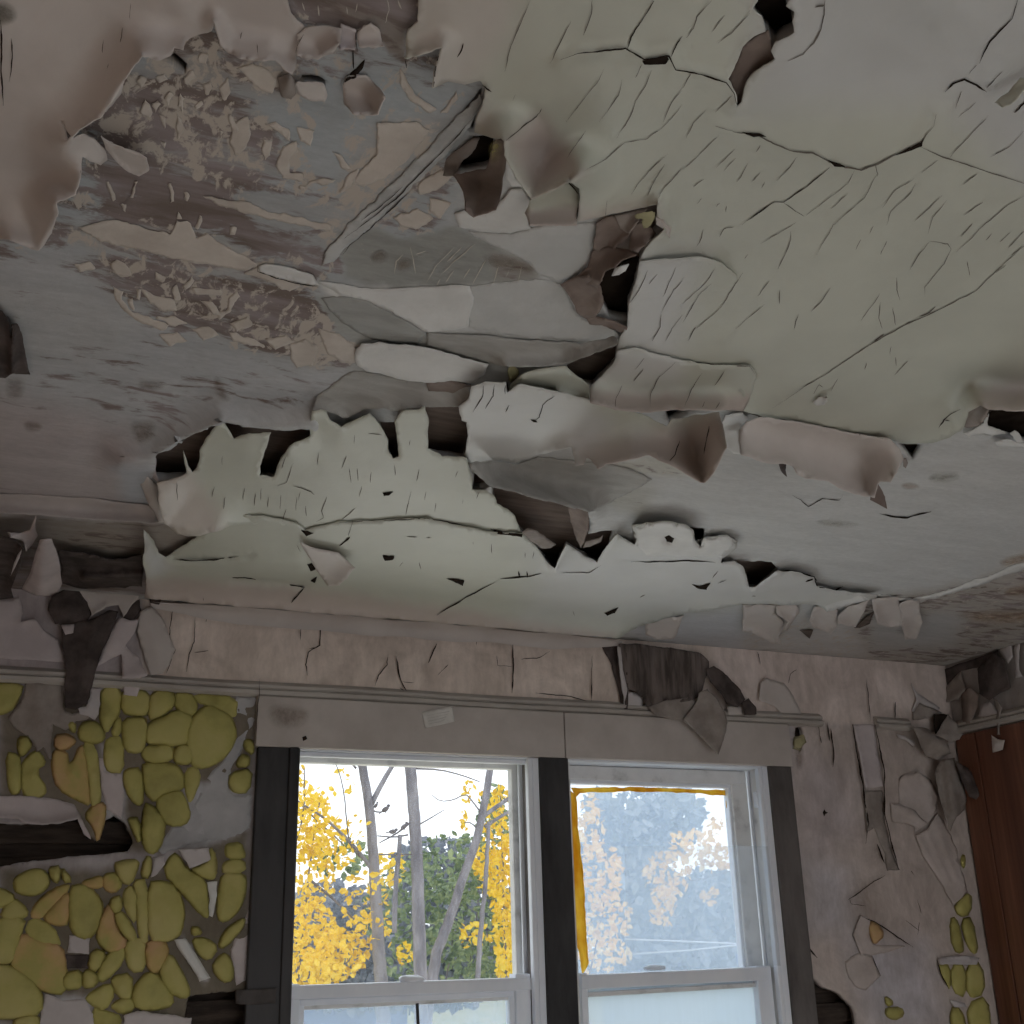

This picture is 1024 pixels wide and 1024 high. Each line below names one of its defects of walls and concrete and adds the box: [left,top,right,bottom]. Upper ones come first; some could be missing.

crack [552,0,1024,460]
peeling [0,0,1024,675]
crack [212,433,598,614]
crack [645,560,726,583]
peeling [0,683,24,715]
crack [375,657,412,690]
crack [497,648,550,690]
crack [539,670,592,701]
peeling [727,706,742,715]
peeling [0,688,256,1024]
peeling [898,772,991,1024]